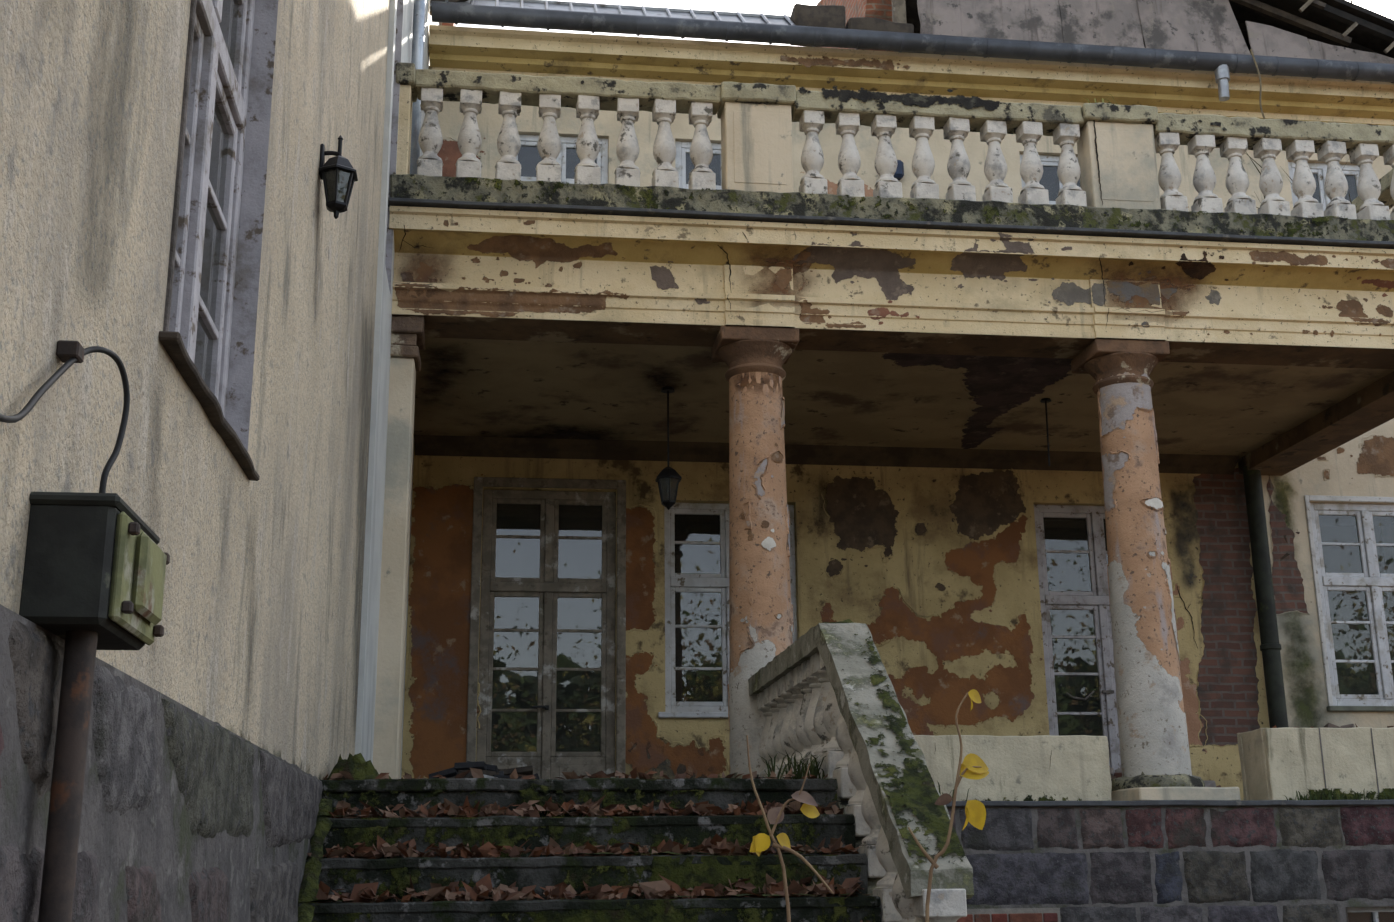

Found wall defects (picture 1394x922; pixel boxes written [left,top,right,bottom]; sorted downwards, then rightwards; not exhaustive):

leakage [92,0,132,219]
peeling [395,219,629,317]
peeling [650,261,679,292]
peeling [766,232,920,328]
peeling [943,232,1394,337]
peeling [1098,372,1160,513]
leakage [355,322,372,718]
peeling [407,474,483,778]
peeling [616,504,658,633]
peeling [626,598,776,778]
peeling [821,469,929,579]
peeling [866,469,1042,736]